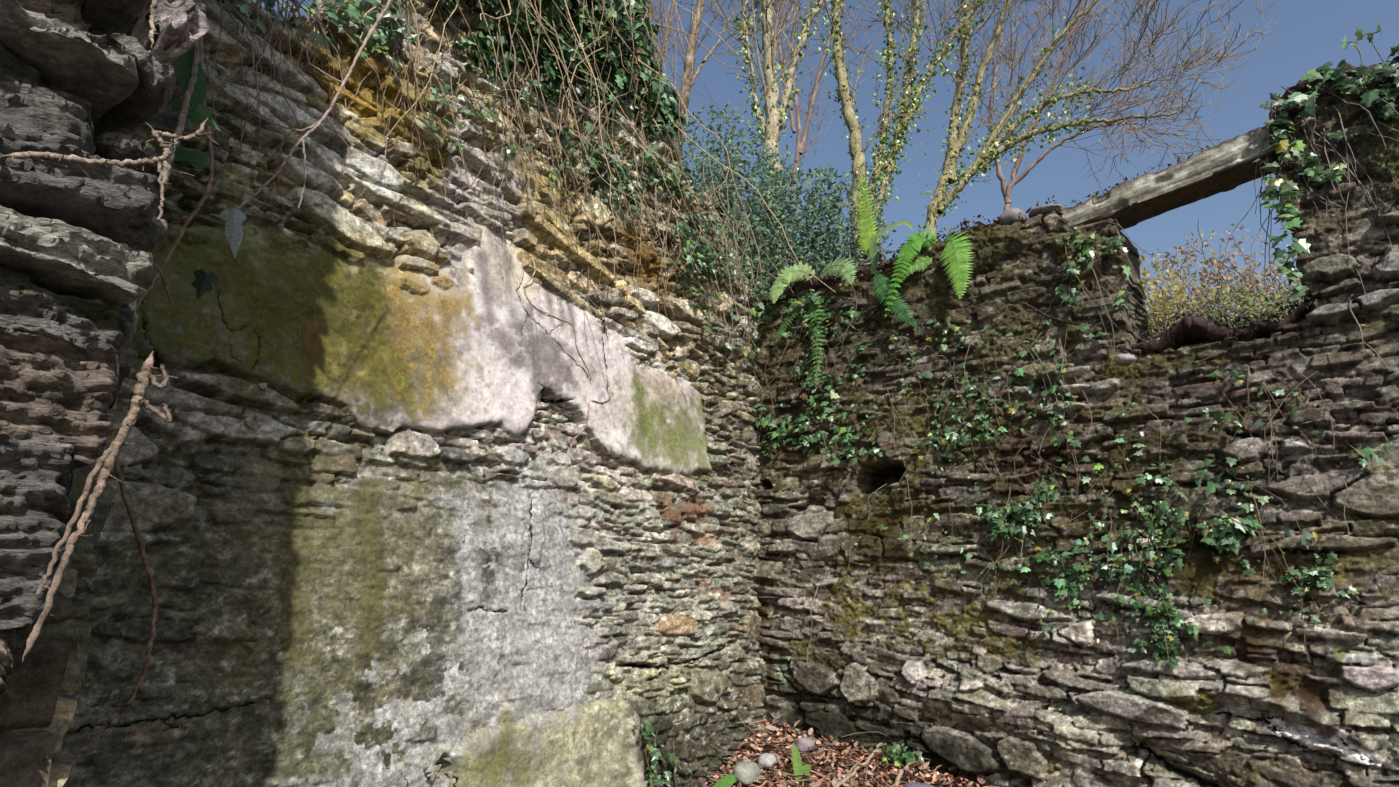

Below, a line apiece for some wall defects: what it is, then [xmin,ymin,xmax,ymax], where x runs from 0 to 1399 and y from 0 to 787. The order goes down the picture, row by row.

flaking render [218,375,613,486]
leakage [284,481,309,661]
leakage [317,455,601,787]
flaking render [571,497,757,711]